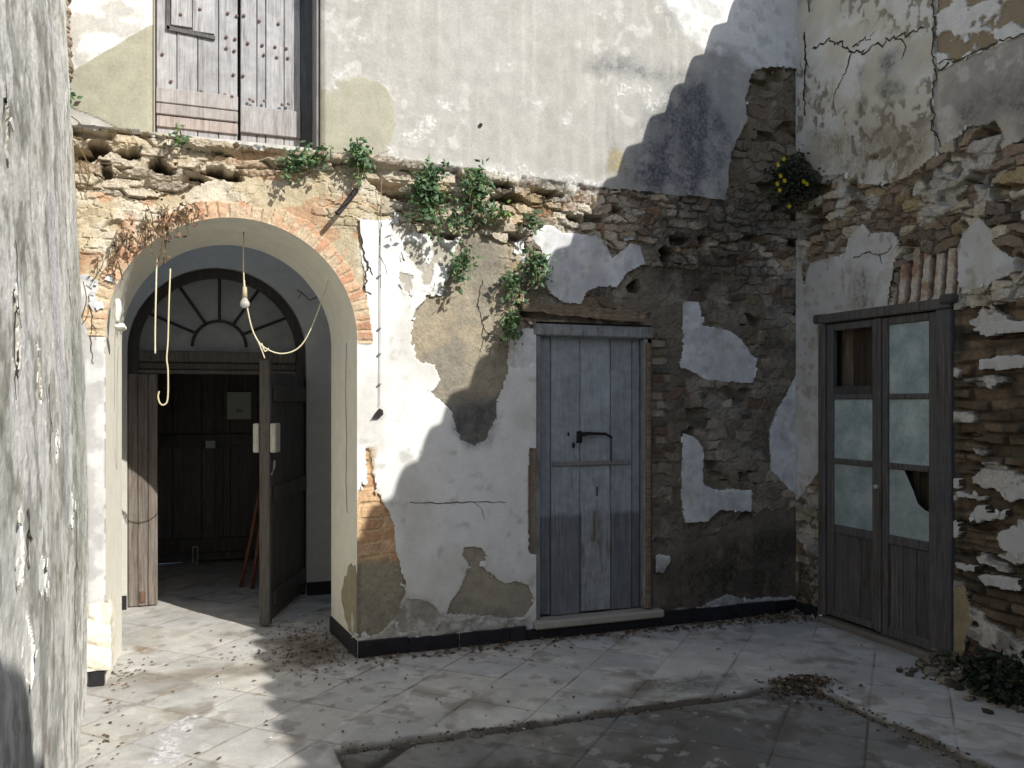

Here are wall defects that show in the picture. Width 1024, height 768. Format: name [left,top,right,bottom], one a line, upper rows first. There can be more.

peeling [934,0,1024,69]
crack [803,0,1024,148]
crack [853,245,895,304]
flaking render [72,66,1024,674]
crack [410,501,506,519]